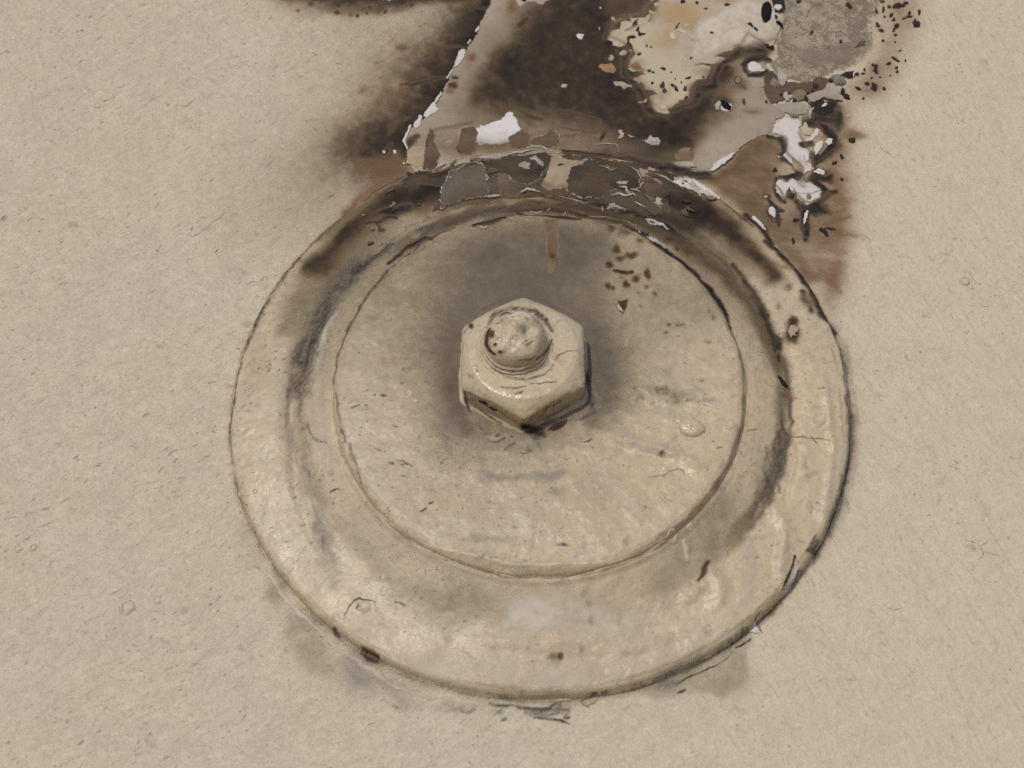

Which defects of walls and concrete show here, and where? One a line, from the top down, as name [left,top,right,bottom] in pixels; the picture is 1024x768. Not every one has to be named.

peeling [386,0,879,250]
corrosion [605,225,656,295]